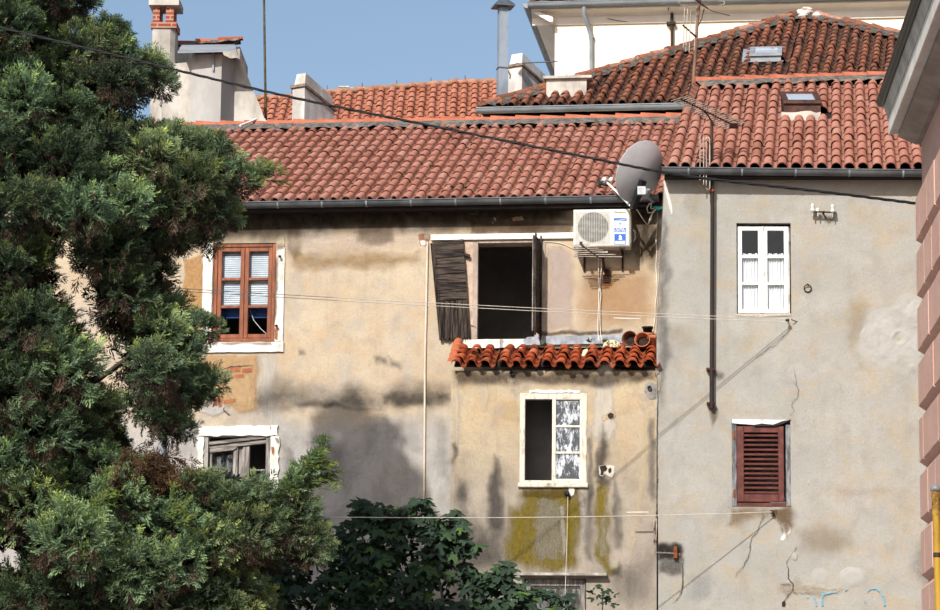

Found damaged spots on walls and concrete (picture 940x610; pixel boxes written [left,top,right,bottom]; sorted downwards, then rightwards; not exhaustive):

spalling [200,356,257,416]
damp [392,365,650,536]
damp [461,463,503,565]